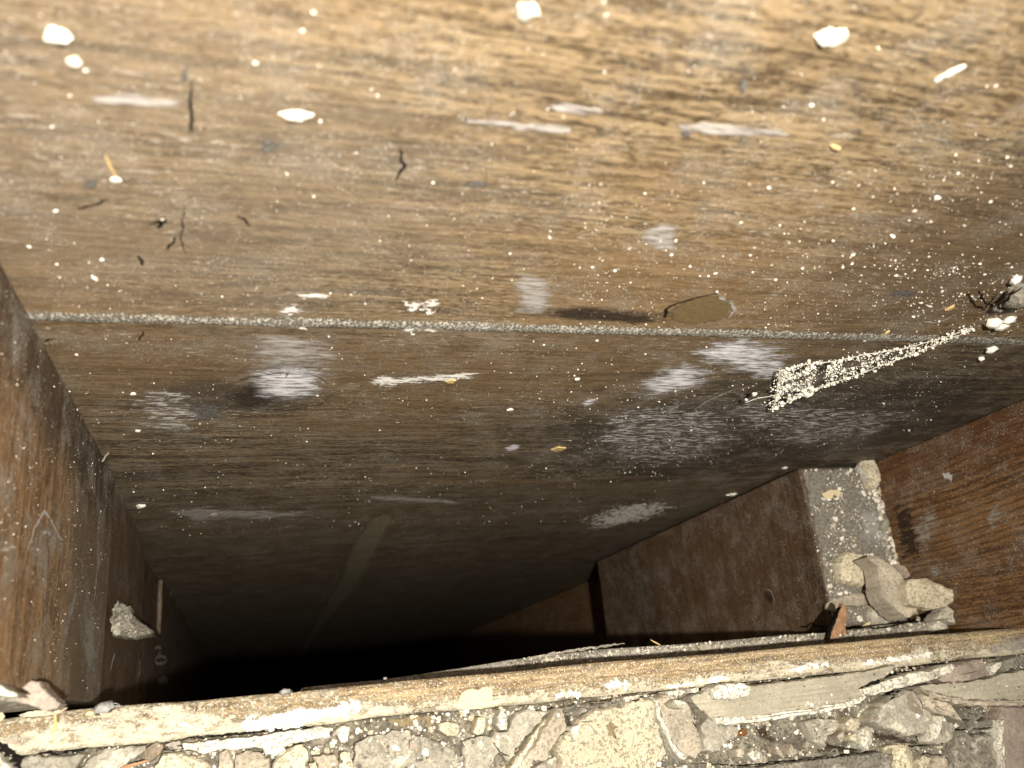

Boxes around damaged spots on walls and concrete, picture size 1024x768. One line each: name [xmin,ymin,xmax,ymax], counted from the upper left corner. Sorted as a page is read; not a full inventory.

damp [231,327,332,410]
damp [371,373,479,387]
damp [643,340,783,395]
damp [581,500,677,530]